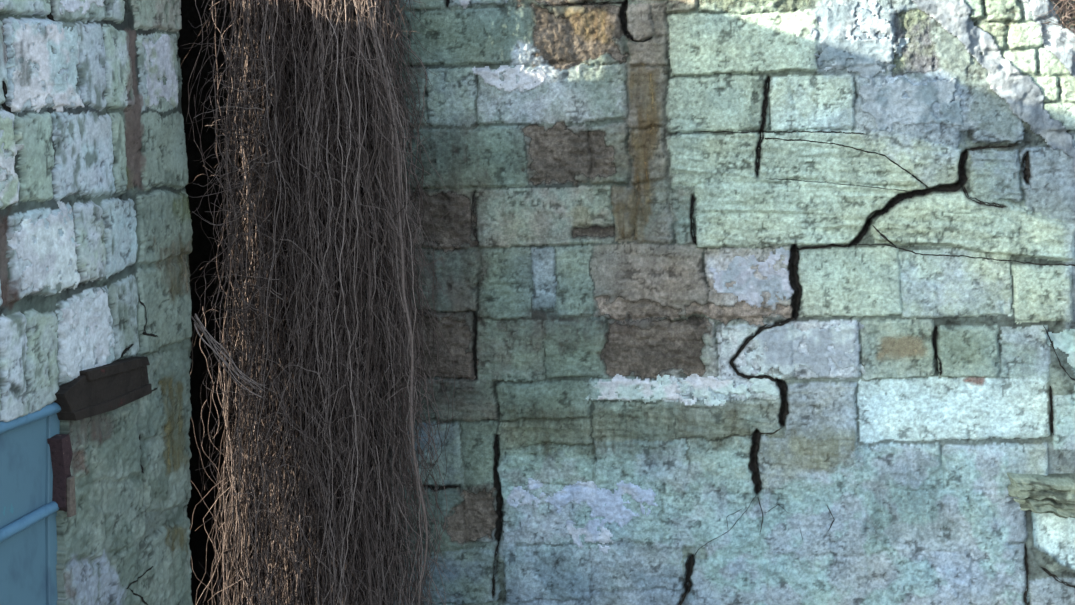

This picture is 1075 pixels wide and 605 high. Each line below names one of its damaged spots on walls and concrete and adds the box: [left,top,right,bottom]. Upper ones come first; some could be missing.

crack [544,0,652,42]
crack [678,76,1075,605]
crack [492,435,502,598]